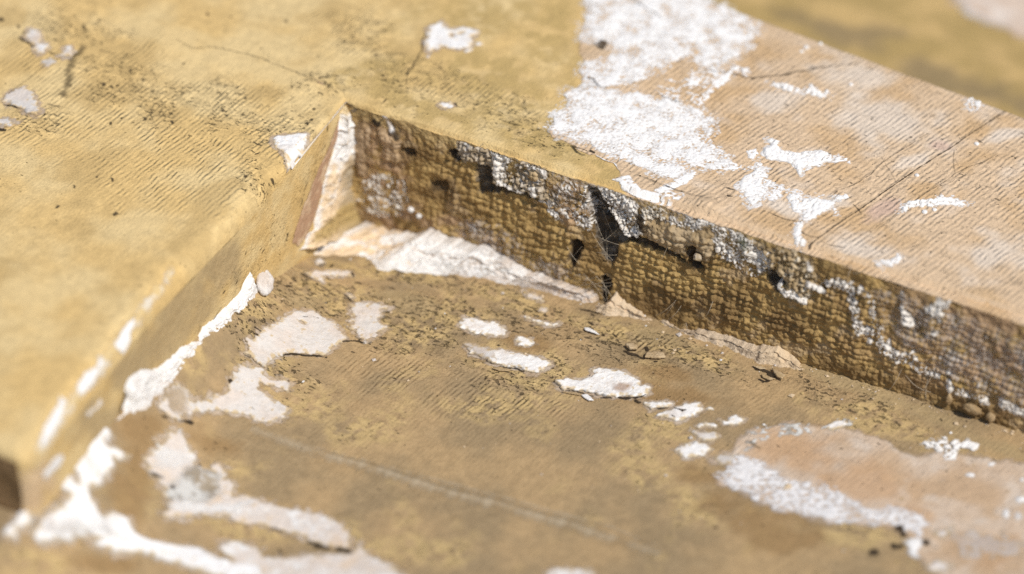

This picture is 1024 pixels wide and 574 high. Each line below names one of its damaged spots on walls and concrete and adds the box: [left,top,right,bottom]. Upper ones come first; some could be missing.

peeling [0,85,58,131]
peeling [17,25,77,67]
peeling [421,19,484,58]
peeling [548,0,1024,326]
crack [774,111,1005,249]
peeling [253,101,1024,574]
peeling [0,266,406,574]